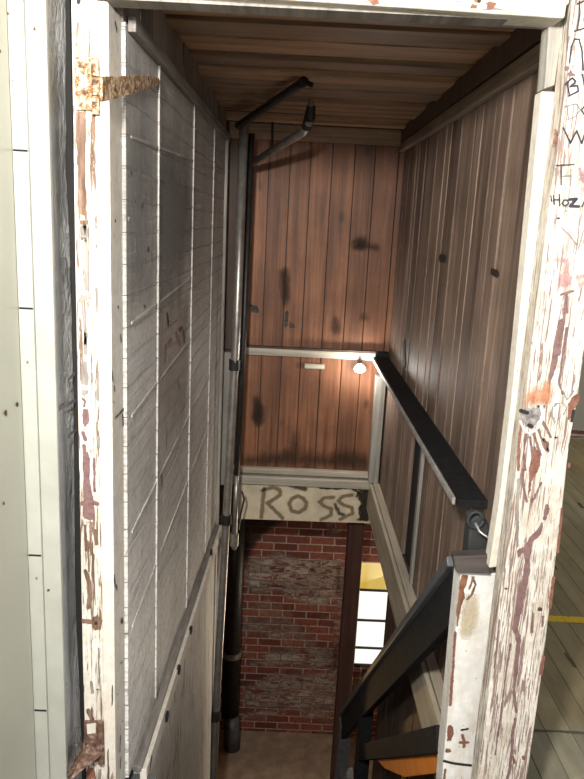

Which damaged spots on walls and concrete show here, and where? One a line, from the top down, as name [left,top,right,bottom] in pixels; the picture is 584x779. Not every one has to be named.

peeling [75,111,102,631]
peeling [548,290,584,434]
peeling [449,575,477,706]
peeling [506,420,552,779]
peeling [86,763,101,779]
peeling [445,725,470,753]